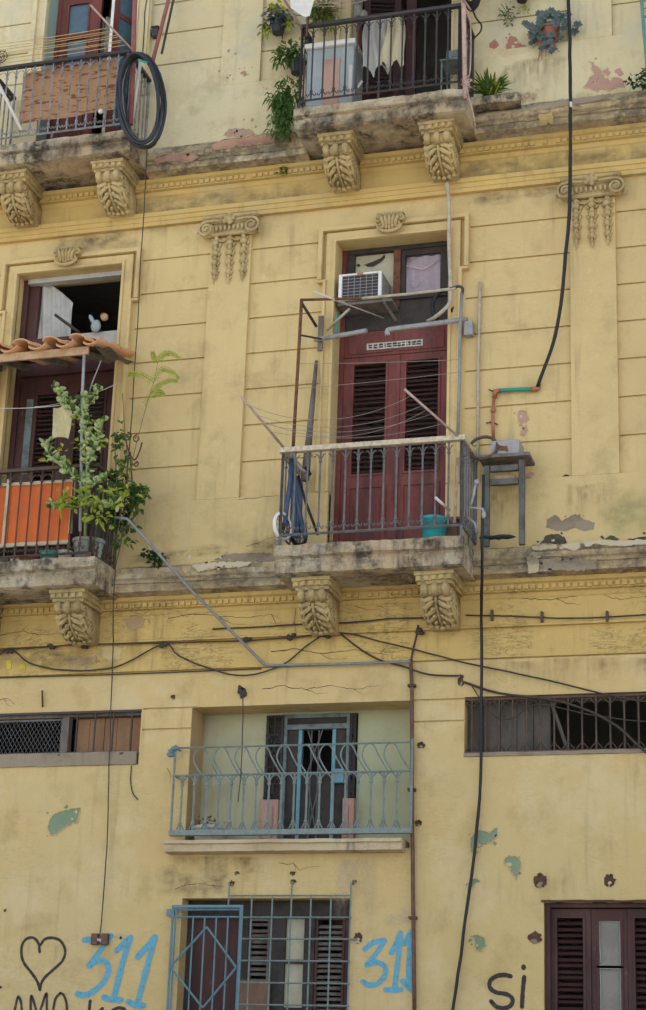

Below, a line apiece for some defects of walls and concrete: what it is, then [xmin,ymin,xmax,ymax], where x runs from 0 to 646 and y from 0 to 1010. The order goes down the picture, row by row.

peeling [489,33,527,49]
peeling [529,57,627,126]
peeling [212,118,296,151]
peeling [514,409,530,436]
spalling [527,514,646,574]
crack [168,608,402,659]
crack [263,685,378,694]
peeling [46,804,81,836]
peeling [469,827,498,859]
peeling [504,855,522,880]
spalling [533,873,547,888]